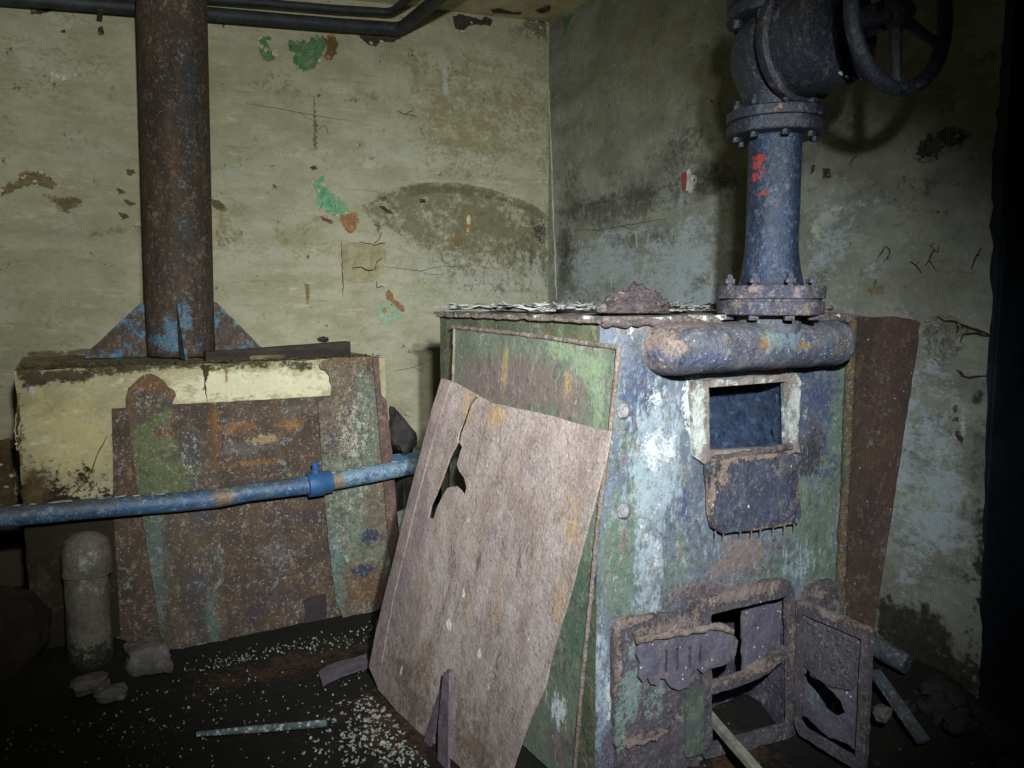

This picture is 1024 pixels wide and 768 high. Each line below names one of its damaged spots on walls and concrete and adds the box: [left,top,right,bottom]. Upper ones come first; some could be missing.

spalling [452,5,551,38]
peeling [257,35,327,72]
spalling [915,126,969,163]
spalling [0,169,82,213]
peeling [309,165,359,233]
crack [341,232,457,292]
peeling [375,289,405,327]
leakage [877,595,970,689]